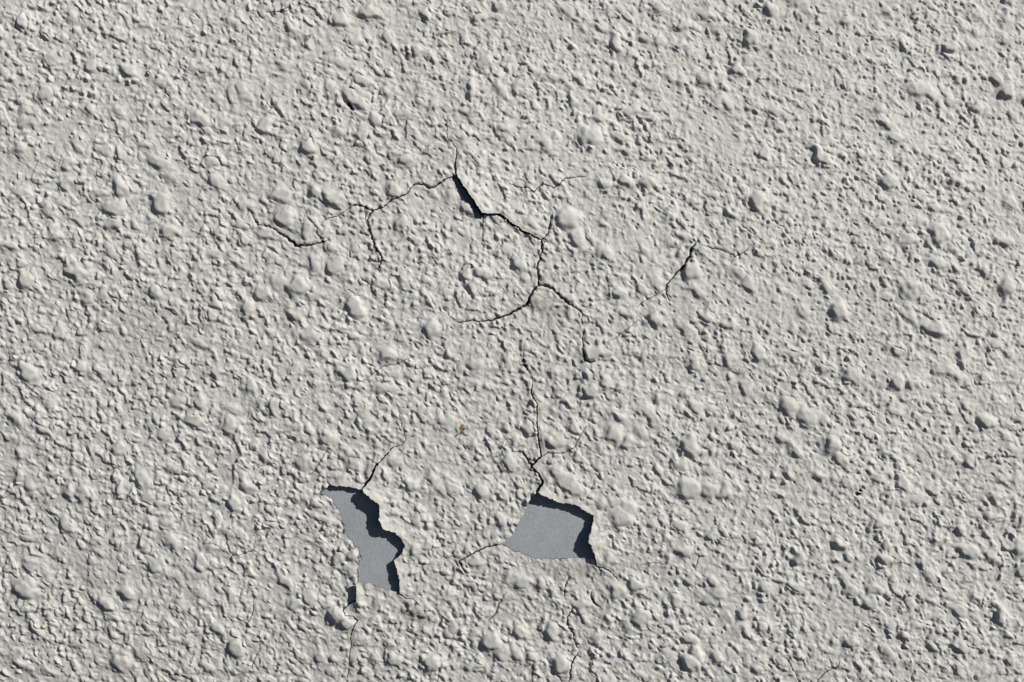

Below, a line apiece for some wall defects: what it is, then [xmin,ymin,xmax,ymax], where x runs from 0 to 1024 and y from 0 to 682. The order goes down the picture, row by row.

crack [249,118,593,363]
crack [614,241,749,339]
crack [364,405,414,485]
crack [492,341,586,492]
peeling [503,378,655,582]
peeling [320,434,468,663]
crack [459,544,502,570]
crack [343,581,358,680]
crack [564,561,617,682]